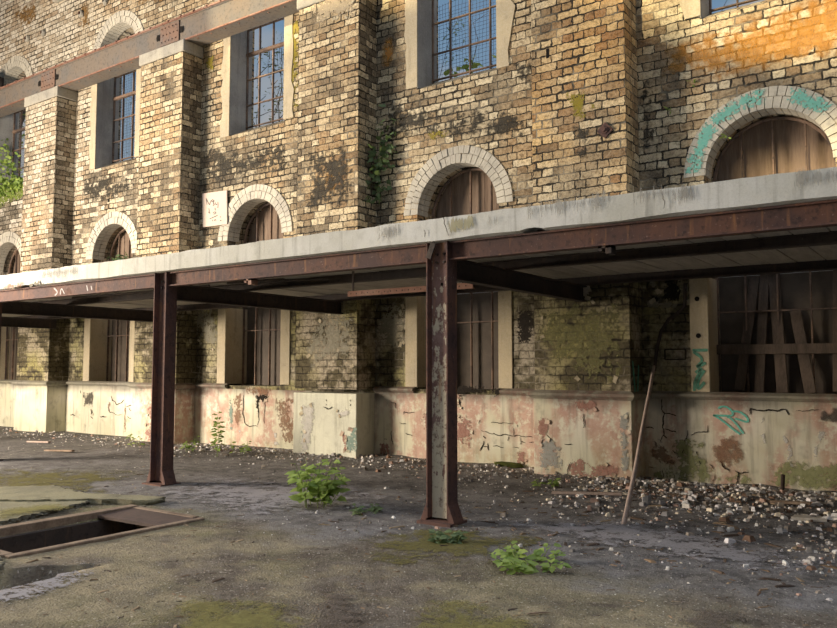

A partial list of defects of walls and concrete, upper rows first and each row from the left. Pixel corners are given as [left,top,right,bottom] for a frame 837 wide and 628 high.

damp [207,144,293,182]
damp [307,147,352,208]
crack [646,399,748,484]
damp [772,436,837,490]
damp [821,409,837,422]